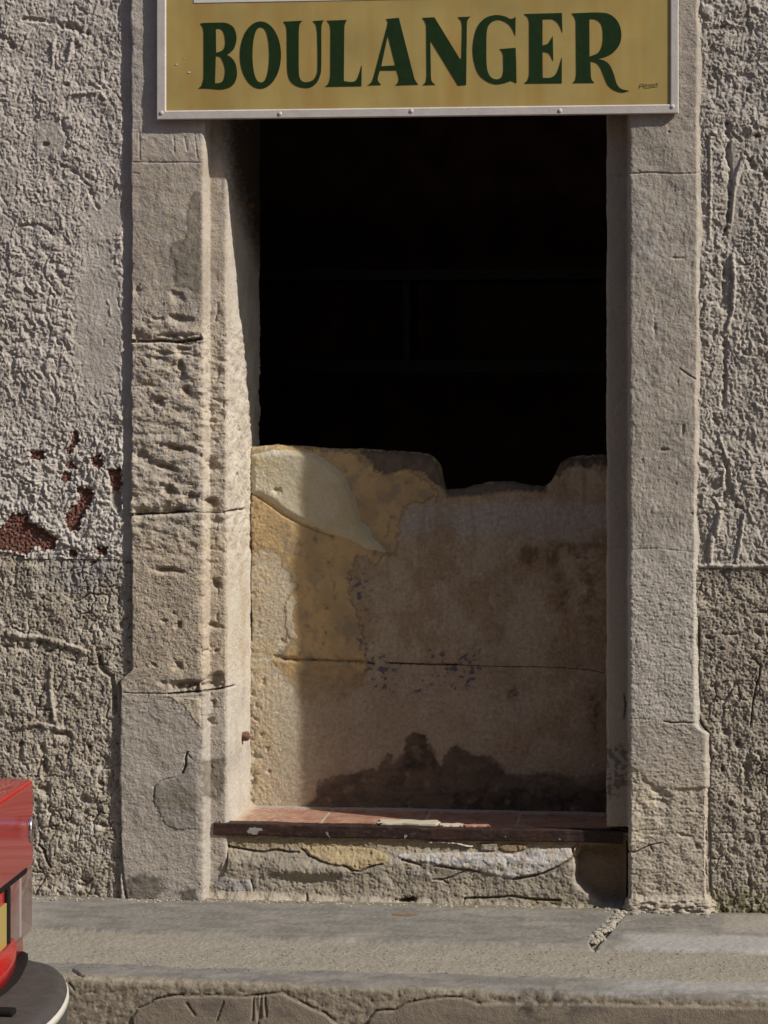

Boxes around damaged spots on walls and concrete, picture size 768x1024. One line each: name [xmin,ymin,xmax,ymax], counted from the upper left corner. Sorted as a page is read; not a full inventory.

flaking render [30,451,45,460]
flaking render [61,430,94,532]
flaking render [90,454,124,513]
flaking render [0,511,58,558]
peeling [249,444,442,689]
crack [367,662,603,673]
leakage [307,733,627,812]
crack [229,846,574,904]